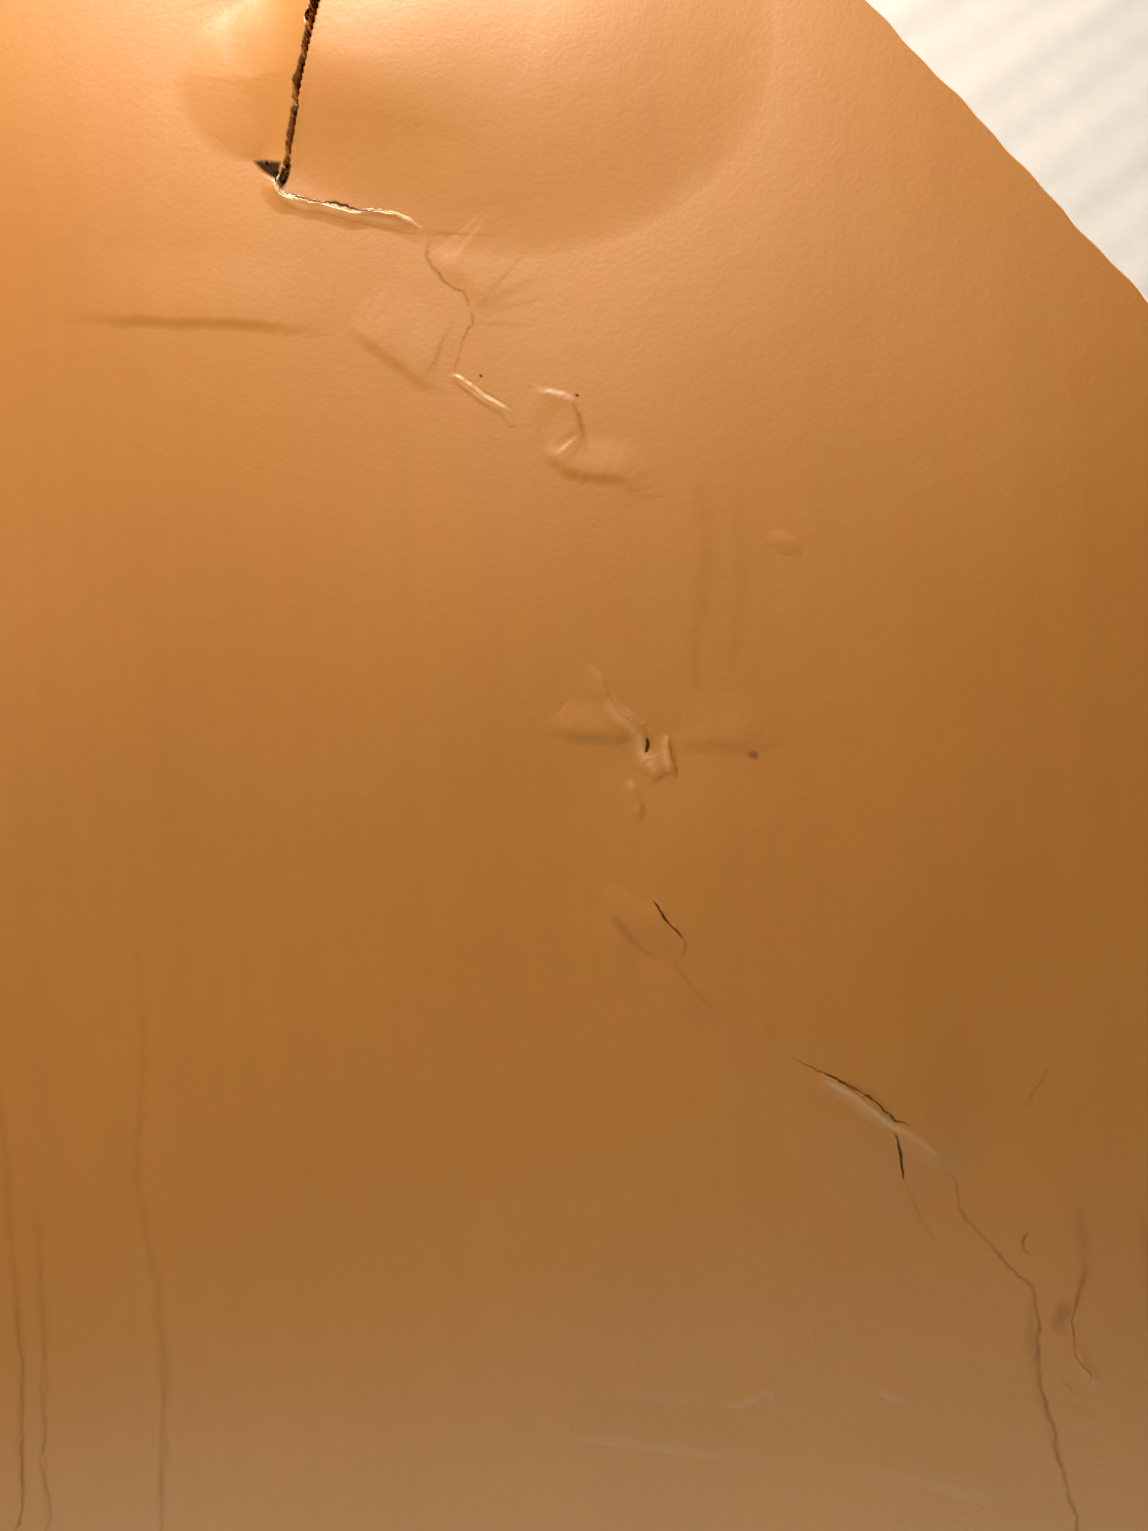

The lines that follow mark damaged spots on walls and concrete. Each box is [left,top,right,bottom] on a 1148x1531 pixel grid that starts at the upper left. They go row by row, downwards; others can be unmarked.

crack [172,0,552,314]
crack [525,384,586,441]
crack [808,1068,987,1177]